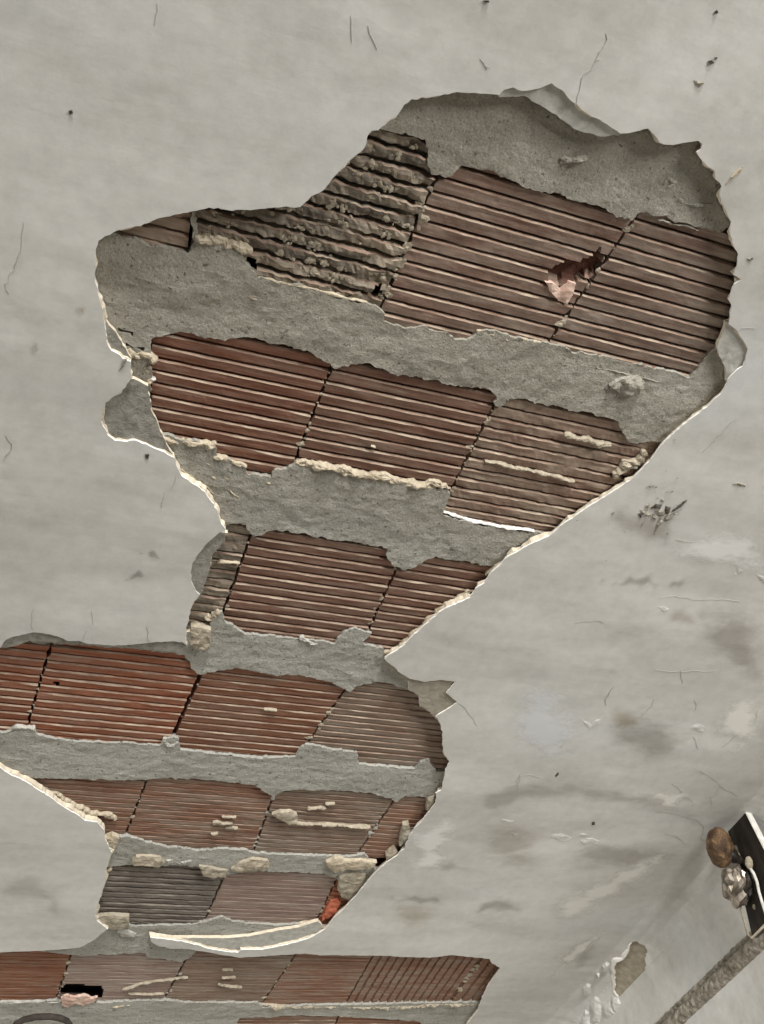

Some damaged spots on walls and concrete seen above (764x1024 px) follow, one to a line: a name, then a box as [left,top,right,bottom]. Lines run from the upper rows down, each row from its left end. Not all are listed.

peeling [498,83,621,137]
peeling [716,319,747,381]
peeling [104,376,173,455]
spalling [564,431,611,448]
peeling [191,530,228,599]
peeling [0,632,67,648]
peeling [126,629,192,653]
peeling [389,664,456,720]
spalling [272,809,298,825]
spalling [322,897,341,921]
spalling [122,976,188,991]
spalling [609,941,647,997]